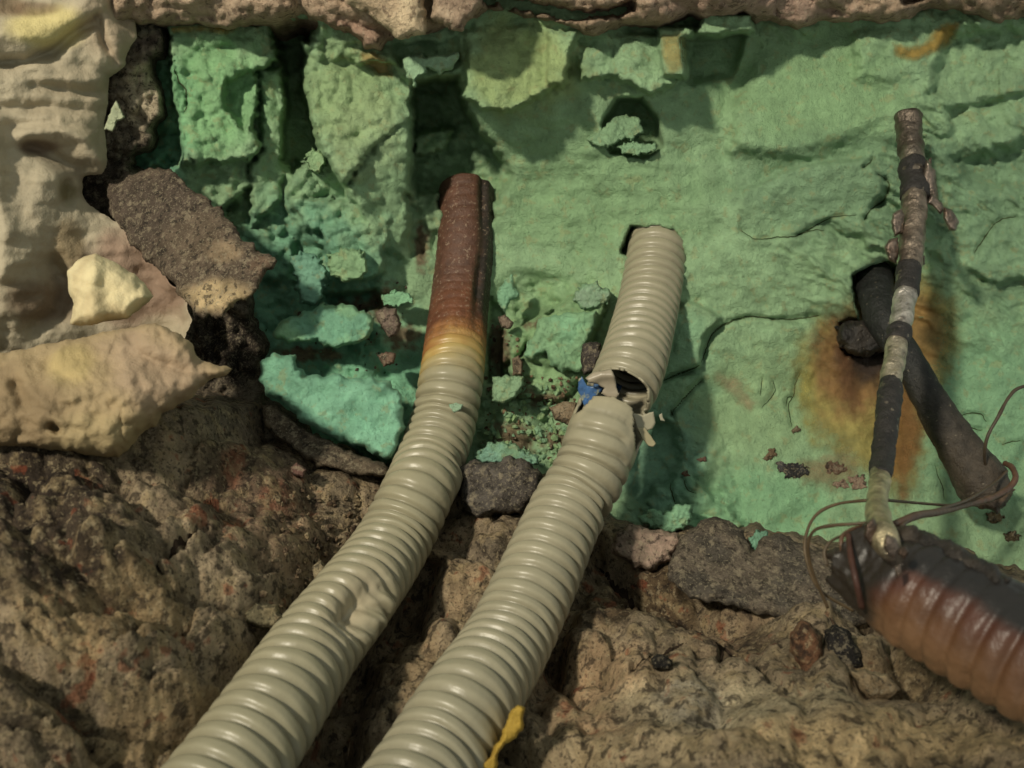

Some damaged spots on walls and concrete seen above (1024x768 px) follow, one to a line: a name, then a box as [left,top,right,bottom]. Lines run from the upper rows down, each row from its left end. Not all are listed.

peeling [305,147,327,174]
peeling [587,114,657,156]
flaking render [103,167,277,322]
rust [800,294,884,467]
rust [912,279,954,384]
rust [891,385,924,500]